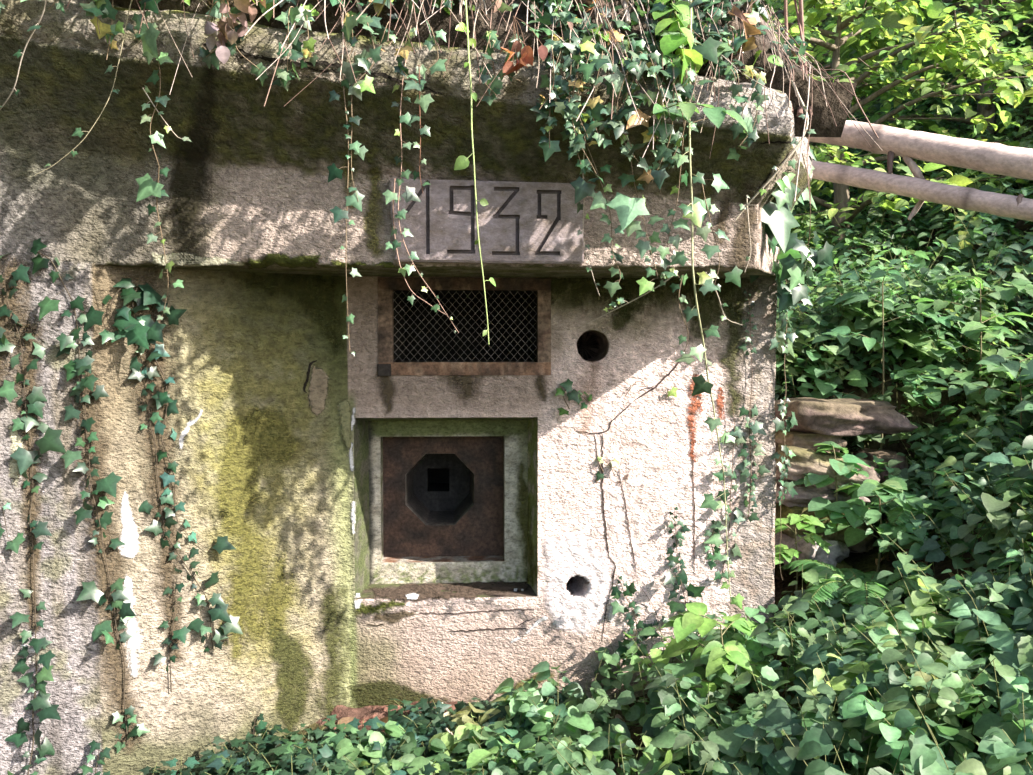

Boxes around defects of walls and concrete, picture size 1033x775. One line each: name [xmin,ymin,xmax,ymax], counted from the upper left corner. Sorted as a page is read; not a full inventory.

water stain [167,49,217,264]
water stain [125,269,182,662]
spalling [308,367,328,416]
crack [575,350,685,639]
corrosion [687,374,703,462]
corrosion [716,387,725,419]
water stain [220,529,294,658]